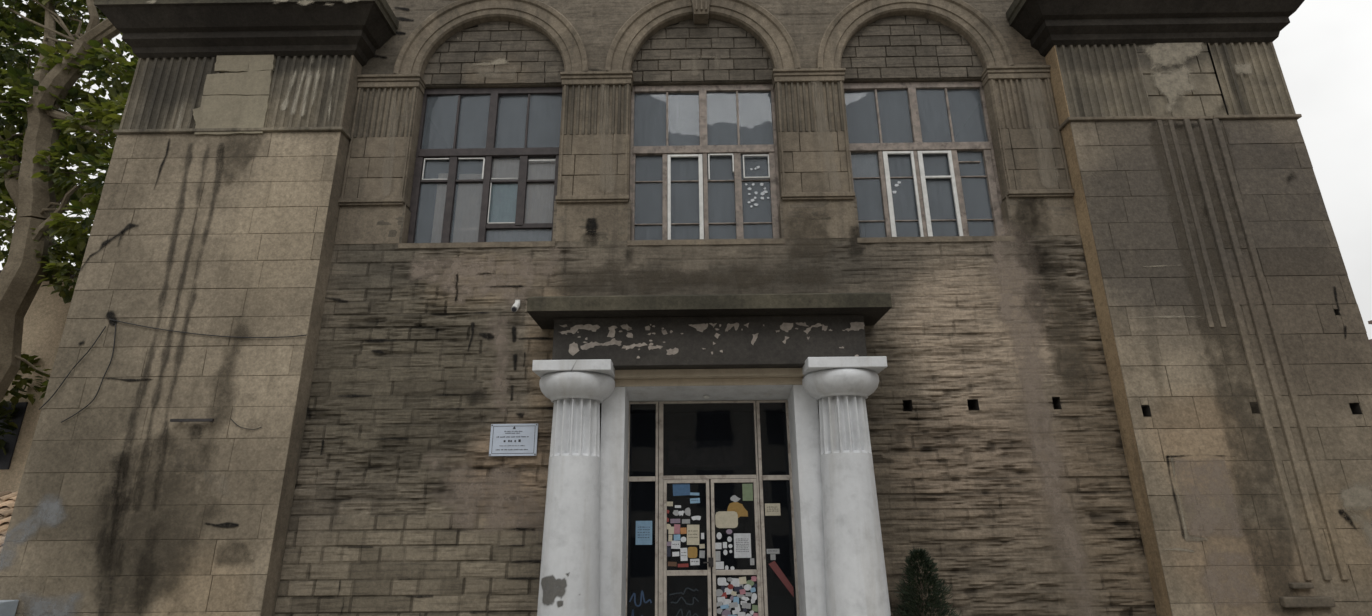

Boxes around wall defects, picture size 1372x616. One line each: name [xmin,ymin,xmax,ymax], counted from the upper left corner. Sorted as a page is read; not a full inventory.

spalling [1146,42,1202,111]
leakage [97,141,252,616]
peeling [560,322,865,358]
leakage [1152,120,1298,613]
peeling [541,573,569,607]